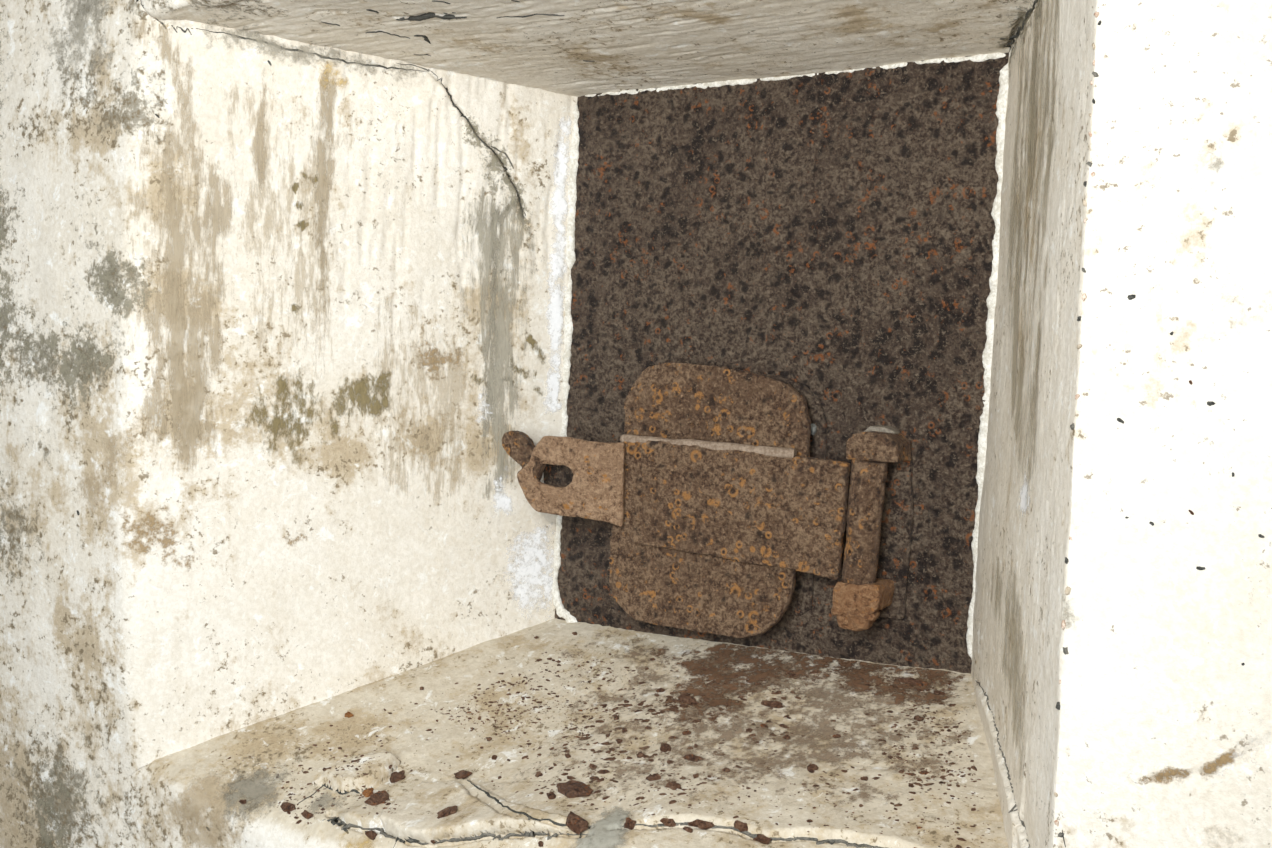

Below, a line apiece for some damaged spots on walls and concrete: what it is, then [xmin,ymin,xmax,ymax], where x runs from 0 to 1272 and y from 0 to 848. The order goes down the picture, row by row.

water stain [0,187,123,409]
water stain [140,24,231,464]
water stain [206,21,347,303]
crack [136,0,526,219]
water stain [462,117,534,498]
rust [280,802,314,819]
rust [362,770,405,806]
crack [298,778,591,848]
rust [546,780,593,835]
crack [622,822,887,848]
rust [650,643,965,728]
crack [975,680,1030,848]